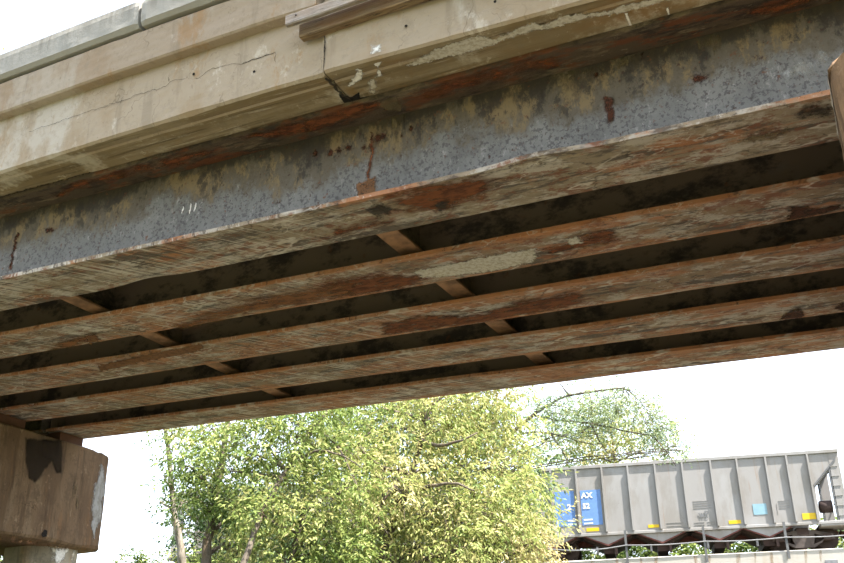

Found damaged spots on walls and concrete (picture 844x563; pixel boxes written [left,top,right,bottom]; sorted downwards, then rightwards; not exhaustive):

crack [323,36,374,103]
corrosion [603,96,615,123]
damp [26,438,62,482]